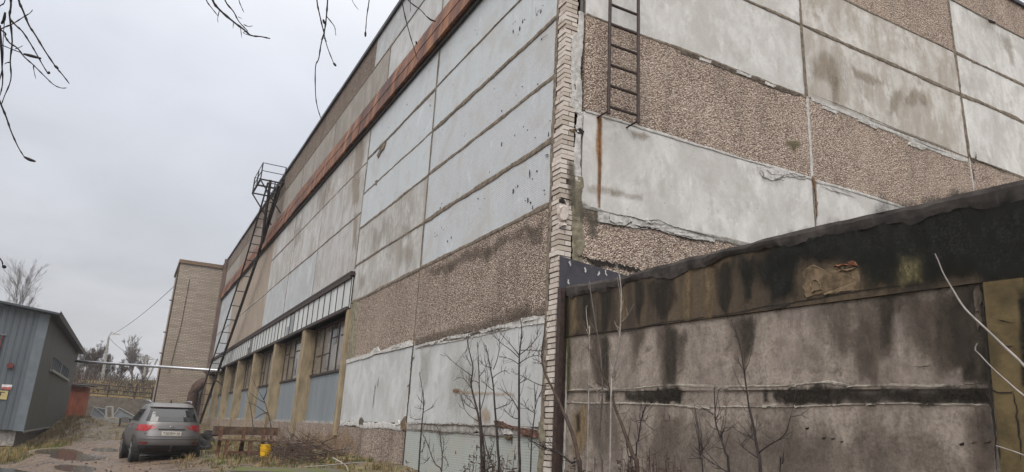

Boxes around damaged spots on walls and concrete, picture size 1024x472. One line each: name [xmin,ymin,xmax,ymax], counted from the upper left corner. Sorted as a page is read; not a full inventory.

peeling [757,166,809,181]
crack [762,173,855,222]
peeling [597,212,715,242]
spalling [802,261,860,298]
peeling [346,316,545,364]
leakage [702,199,1024,472]